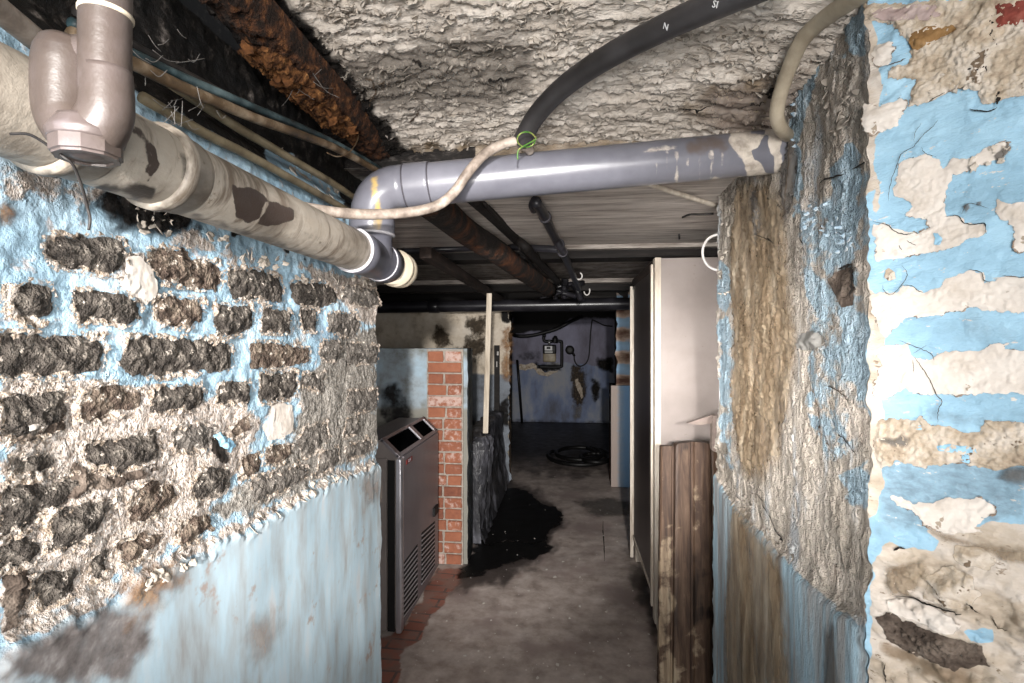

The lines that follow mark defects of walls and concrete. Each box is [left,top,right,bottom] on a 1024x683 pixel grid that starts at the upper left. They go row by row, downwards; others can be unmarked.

rust [237,37,360,146]
peeling [789,0,1024,137]
spalling [802,202,856,307]
peeling [869,140,1024,400]
spalling [0,206,382,633]
mould [463,316,486,362]
water stain [535,362,600,419]
spalling [875,563,990,672]